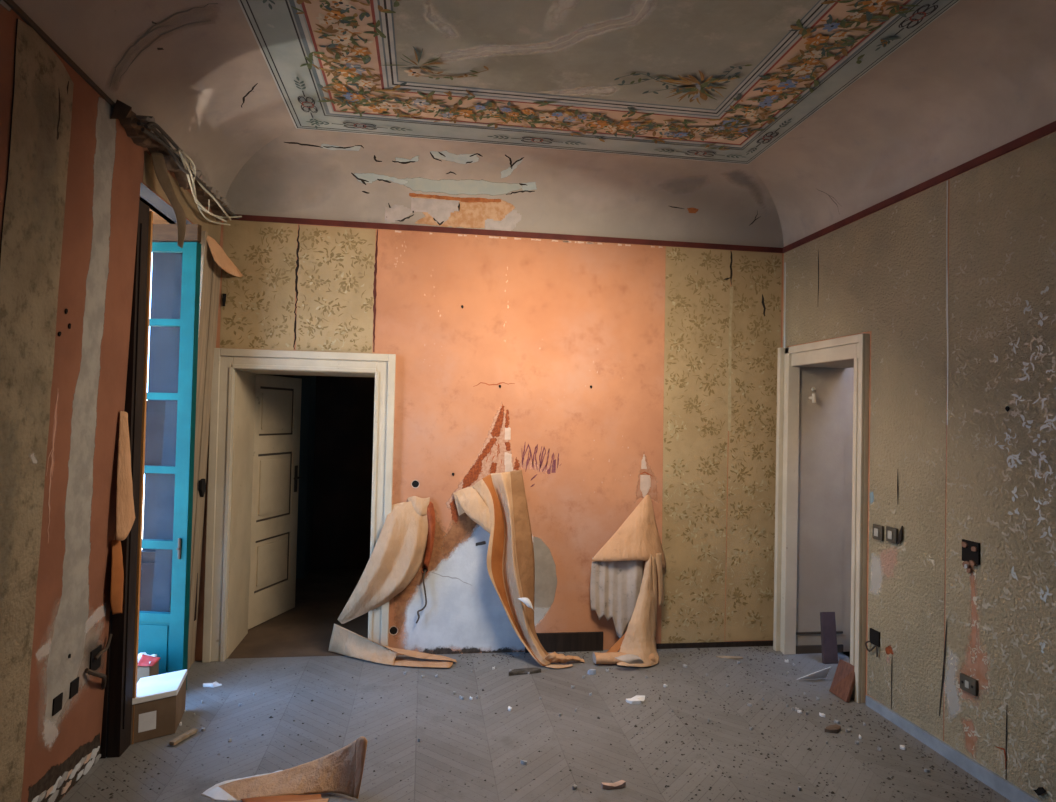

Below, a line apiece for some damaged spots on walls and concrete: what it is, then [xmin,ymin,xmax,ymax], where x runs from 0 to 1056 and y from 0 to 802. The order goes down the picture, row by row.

spalling [351,151,602,267]
peeling [462,406,520,489]
flaking render [389,499,525,654]
spalling [52,634,112,716]
spalling [28,733,101,802]